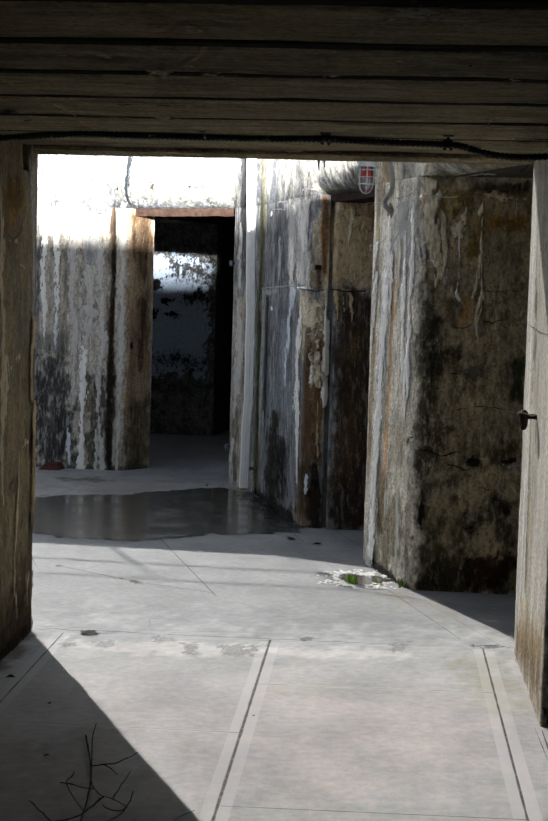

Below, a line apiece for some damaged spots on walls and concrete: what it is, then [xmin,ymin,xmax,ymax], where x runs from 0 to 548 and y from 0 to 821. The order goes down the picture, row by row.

damp [0,155,150,606]
damp [232,222,245,422]
damp [244,160,316,540]
rust [300,327,322,529]
damp [329,200,462,589]
damp [503,407,536,606]
damp [524,272,538,403]